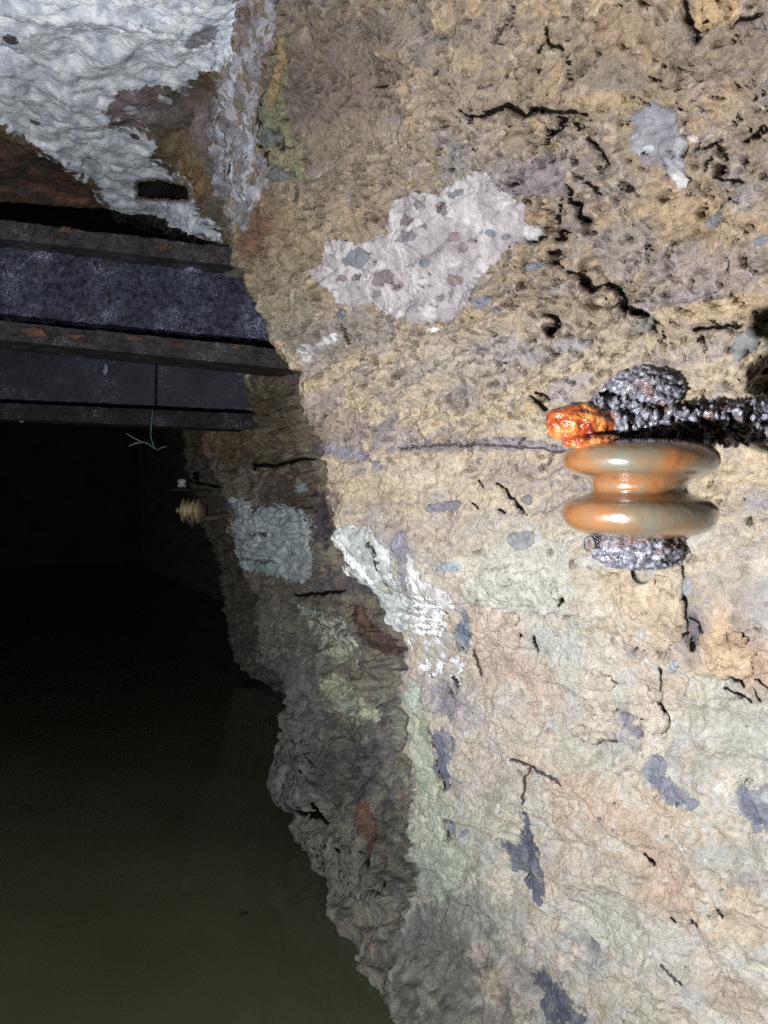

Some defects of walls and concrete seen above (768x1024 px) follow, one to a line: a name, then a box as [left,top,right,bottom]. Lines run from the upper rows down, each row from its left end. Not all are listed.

spalling [309,170,545,325]
crack [458,103,666,340]
crack [252,458,317,471]
rust [562,434,625,448]
crack [680,565,701,652]
water stain [225,482,473,903]
crack [651,667,670,735]
crack [509,759,560,805]